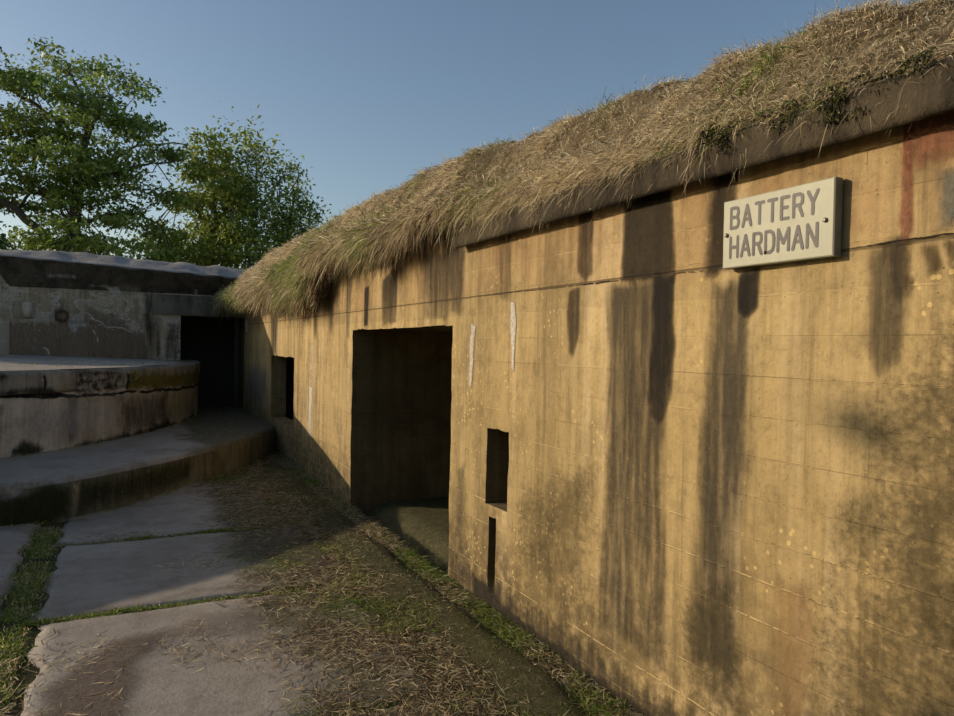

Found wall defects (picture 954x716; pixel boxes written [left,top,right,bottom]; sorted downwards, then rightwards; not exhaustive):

peeling [9,298,147,359]
damp [567,212,592,354]
damp [707,171,737,275]
damp [873,241,908,364]
crack [852,233,954,249]
damp [927,241,953,271]
spalling [7,375,56,396]
spalling [76,371,130,394]
damp [604,190,674,643]
damp [685,268,759,688]